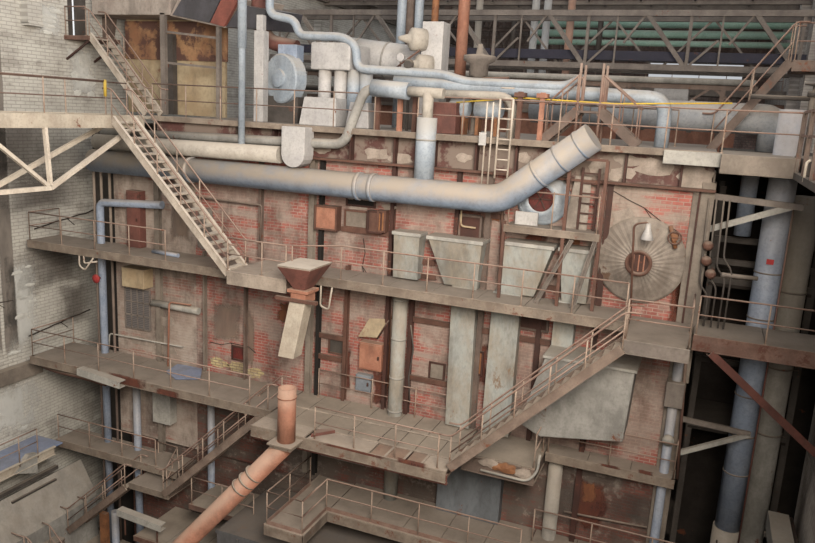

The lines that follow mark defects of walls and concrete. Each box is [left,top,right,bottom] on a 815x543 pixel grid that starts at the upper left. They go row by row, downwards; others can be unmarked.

corrosion [125,21,228,62]
flaking render [364,148,413,164]
flaking render [456,153,473,163]
flaking render [518,152,537,164]
corrosion [568,479,607,529]